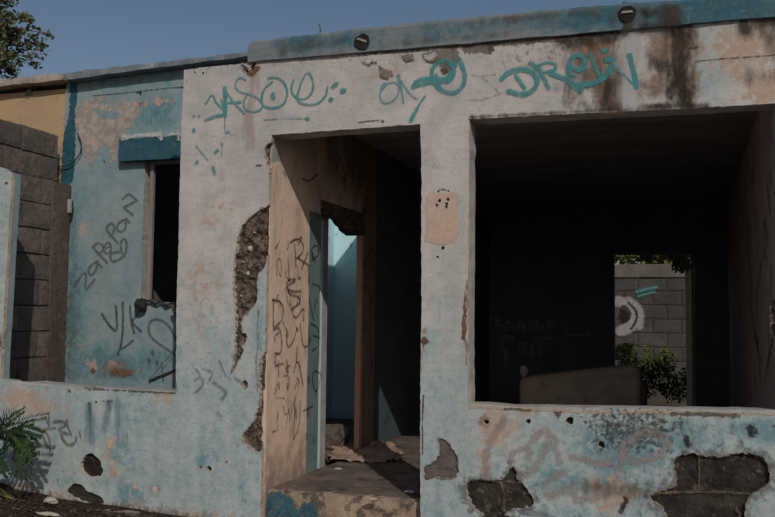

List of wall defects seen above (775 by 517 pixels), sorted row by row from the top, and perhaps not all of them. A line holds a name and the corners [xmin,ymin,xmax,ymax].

water stain [740,19,775,43]
peeling [61,93,183,165]
spalling [230,207,269,374]
spalling [241,355,266,451]
spalling [68,483,104,504]
spalling [83,453,115,476]
spalling [424,437,459,480]
spalling [465,466,534,517]
spalling [651,451,770,517]